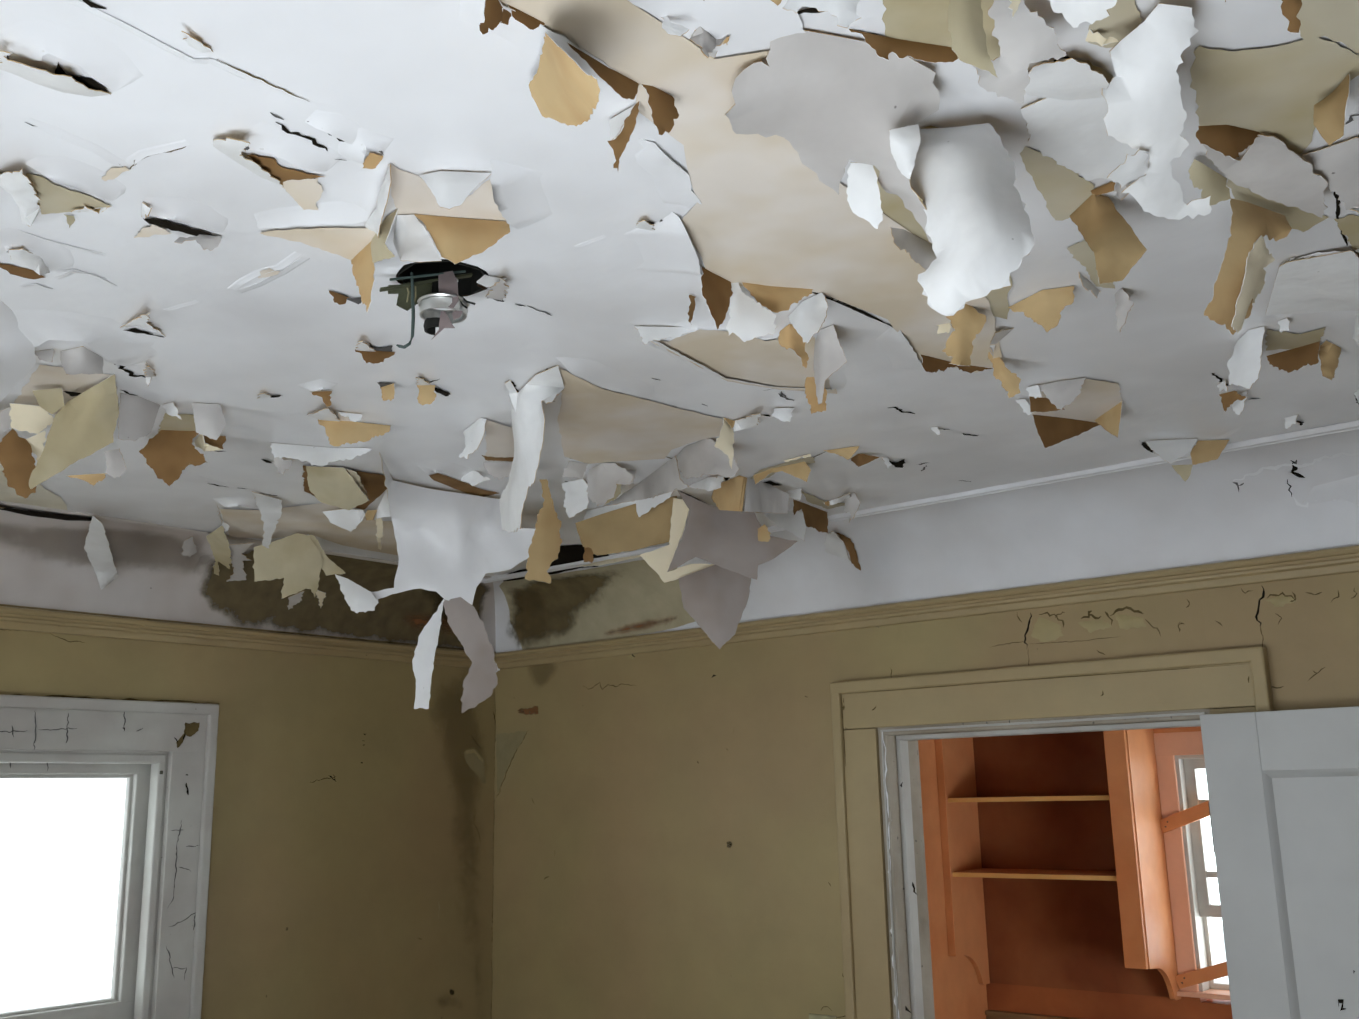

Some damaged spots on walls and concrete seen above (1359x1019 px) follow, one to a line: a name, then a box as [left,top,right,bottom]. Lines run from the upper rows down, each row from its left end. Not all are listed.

peeling [0,264,46,279]
peeling [0,155,129,228]
peeling [247,128,553,313]
peeling [458,0,1359,448]
peeling [0,300,226,510]
peeling [181,357,879,722]
water stain [202,550,464,650]
water stain [472,560,696,650]
crack [990,613,1114,665]
crack [1241,586,1265,647]
crack [0,712,77,771]
crack [166,820,198,980]